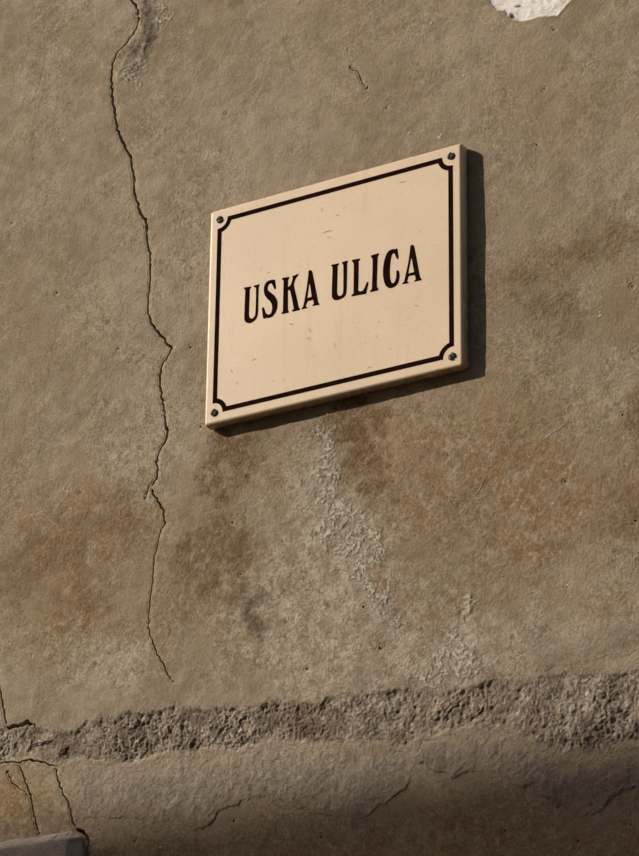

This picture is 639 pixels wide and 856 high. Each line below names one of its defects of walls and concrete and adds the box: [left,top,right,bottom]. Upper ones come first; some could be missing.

peeling [485,0,572,33]
crack [98,0,175,683]
crack [0,674,35,734]
spalling [0,661,639,833]
crack [0,757,92,856]